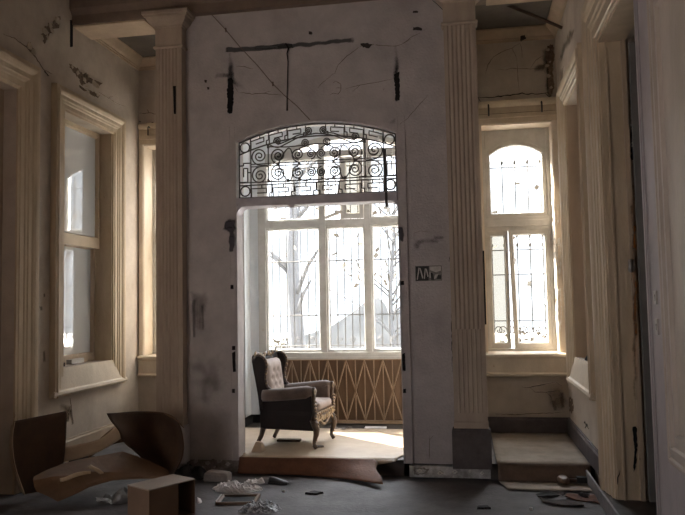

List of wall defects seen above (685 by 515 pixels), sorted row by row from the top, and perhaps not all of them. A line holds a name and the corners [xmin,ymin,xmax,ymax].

flaking render [69,64,102,98]
crack [478,48,550,102]
flaking render [545,44,555,97]